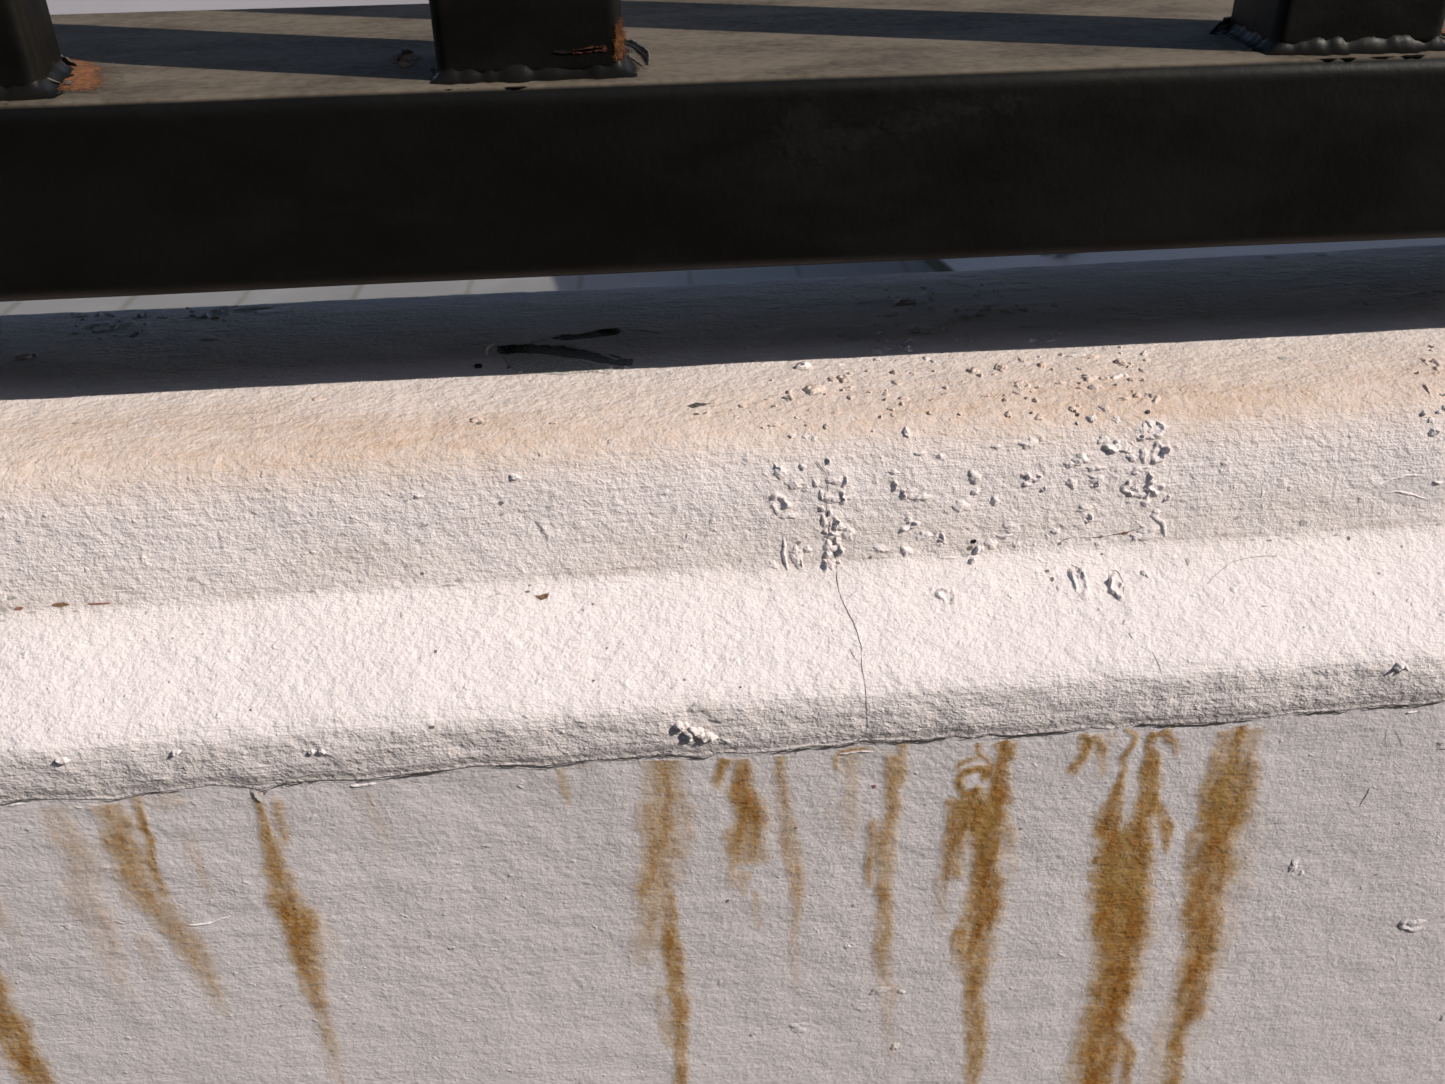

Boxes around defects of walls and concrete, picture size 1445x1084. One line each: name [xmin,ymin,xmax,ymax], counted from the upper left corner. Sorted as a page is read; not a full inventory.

spalling [474,328,663,375]
peeling [940,539,984,565]
crack [488,461,1253,768]
crack [0,781,317,805]
crack [351,770,453,782]
corrosion [714,758,768,862]
crack [1293,702,1441,745]
corrosion [256,792,326,1010]
corrosion [944,740,1017,1084]
corrosion [1068,727,1177,1084]
corrosion [1166,725,1258,1084]
corrosion [0,979,53,1084]